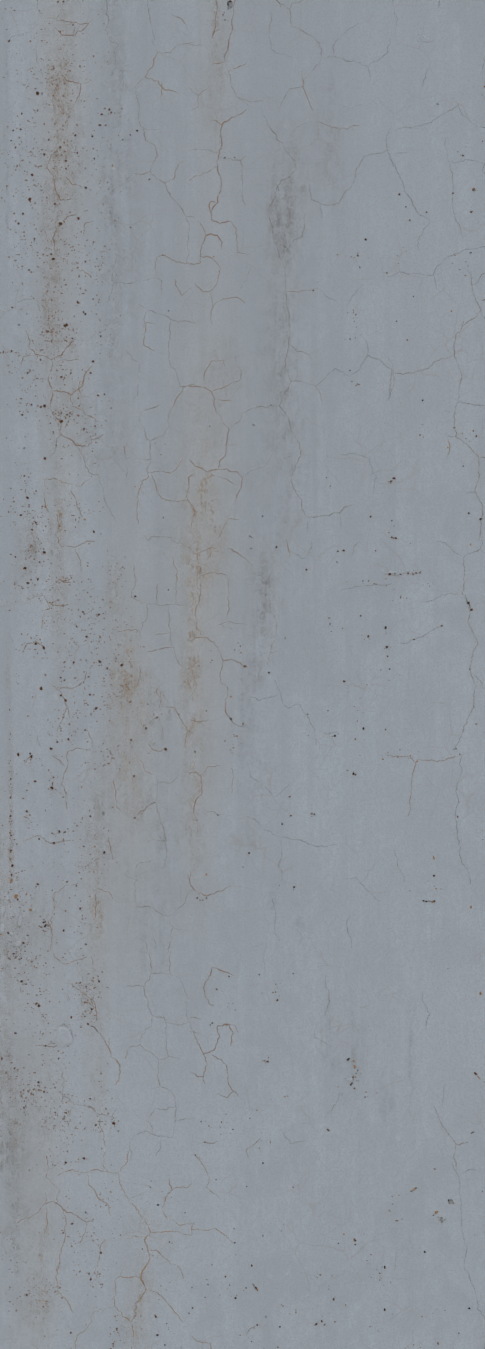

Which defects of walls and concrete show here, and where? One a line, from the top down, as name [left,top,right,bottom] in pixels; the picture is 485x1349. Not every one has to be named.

crack [143,1,245,349]
crack [22,343,125,449]
crack [119,361,242,806]
crack [193,970,234,1097]
crack [18,1107,223,1347]